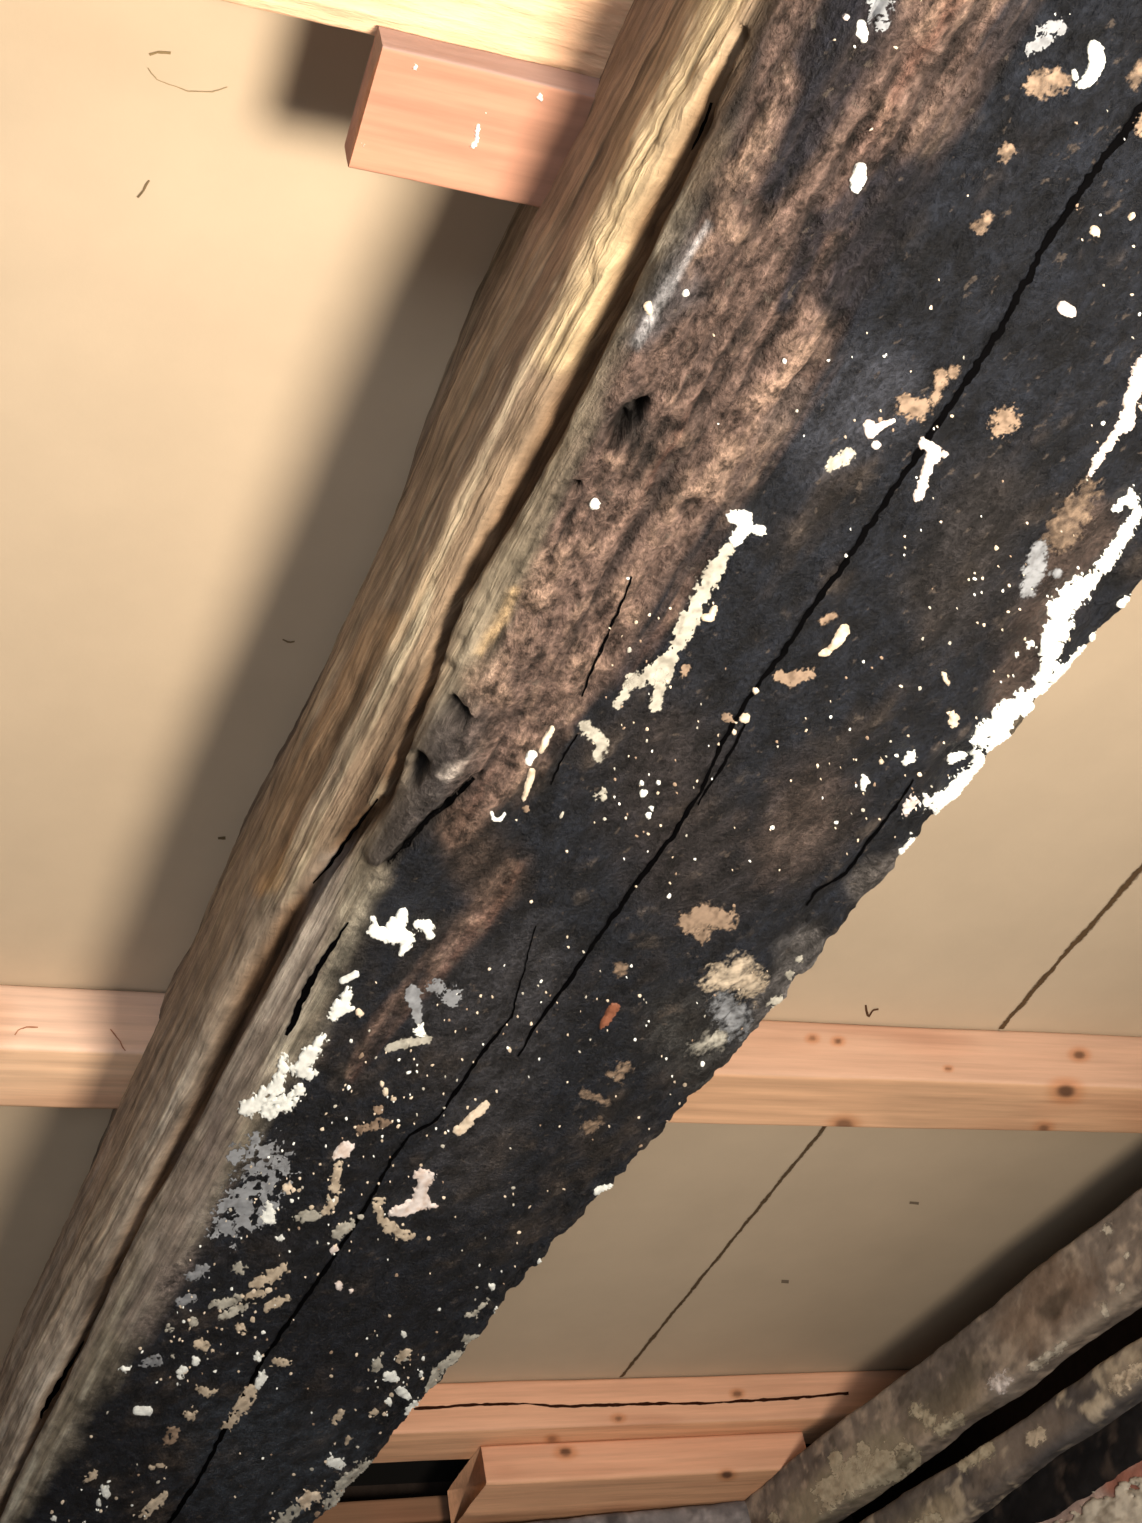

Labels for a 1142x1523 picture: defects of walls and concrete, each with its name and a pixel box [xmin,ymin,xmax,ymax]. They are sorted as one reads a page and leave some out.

damp [612,664,691,712]
damp [521,725,555,813]
crack [167,102,1142,1523]
damp [424,978,464,1008]
damp [385,1022,433,1052]
damp [321,1160,344,1217]
damp [253,1350,292,1390]